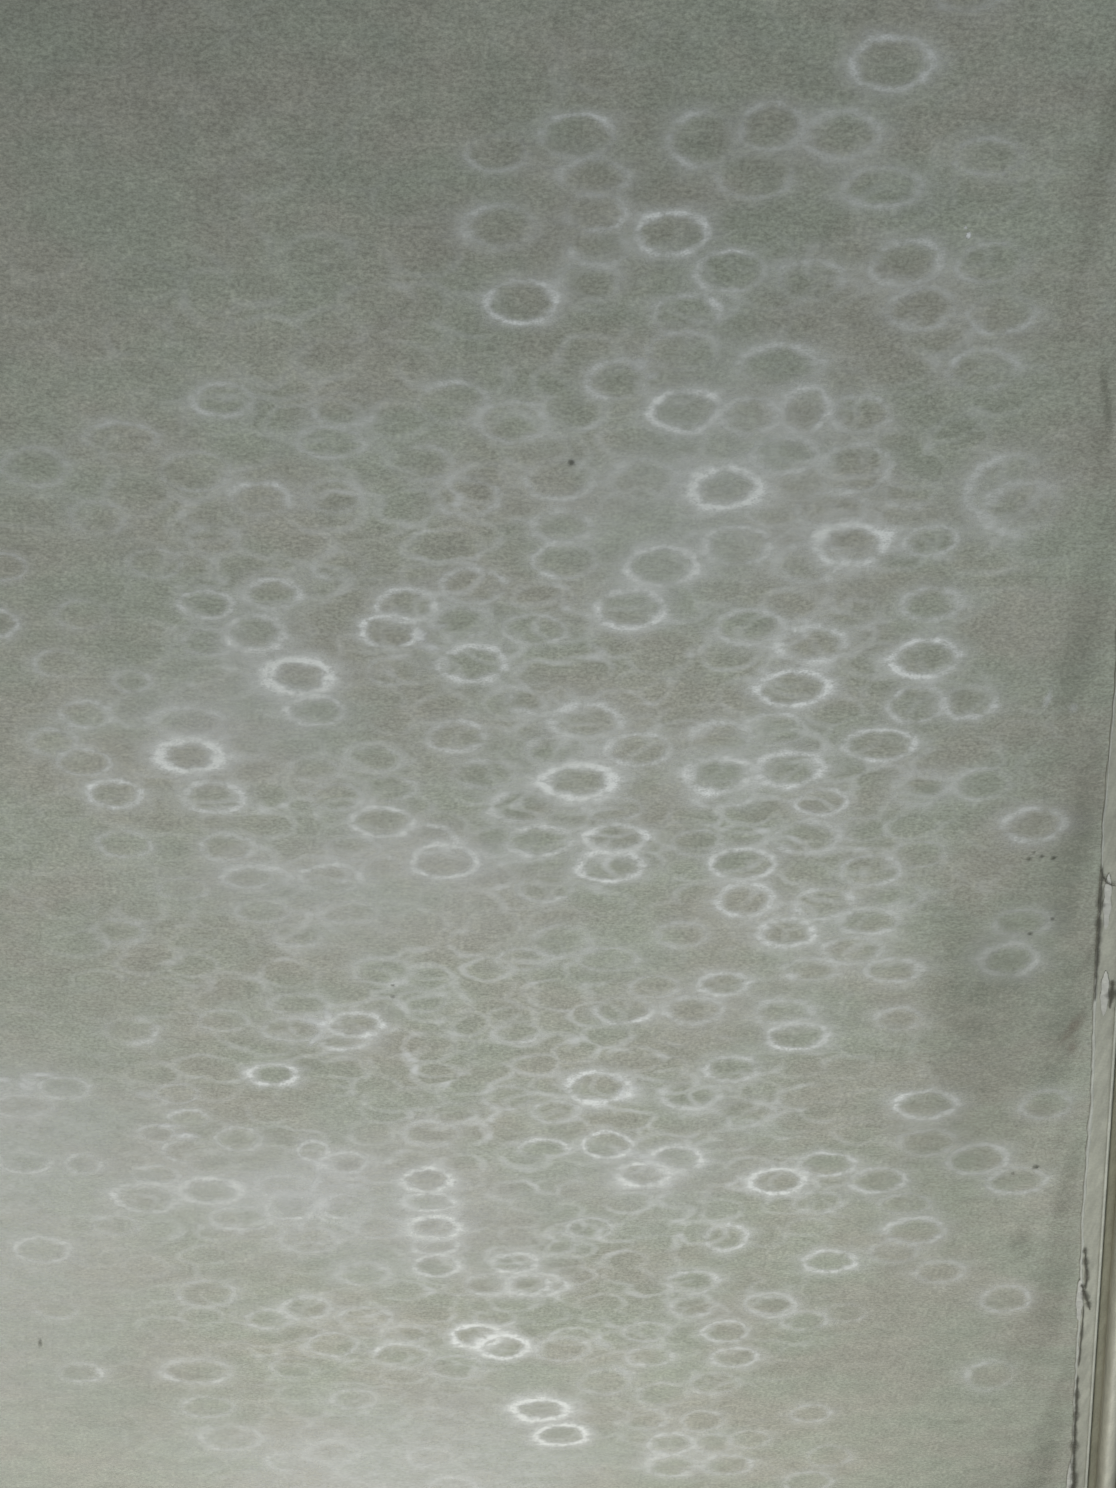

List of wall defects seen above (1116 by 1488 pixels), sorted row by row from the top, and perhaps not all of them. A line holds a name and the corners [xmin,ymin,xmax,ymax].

damp [593,184,753,319]
damp [591,384,959,634]
damp [176,577,344,726]
damp [356,567,556,685]
damp [146,733,364,889]
damp [486,588,998,983]
damp [593,971,832,1051]
damp [396,1146,573,1297]
damp [517,1068,709,1190]
damp [742,1151,908,1213]
damp [448,1322,538,1361]
damp [503,1393,594,1447]